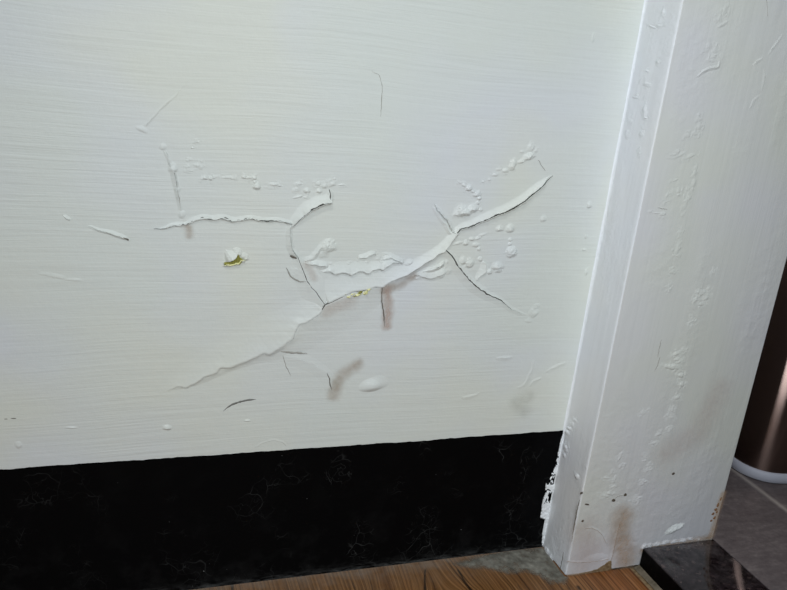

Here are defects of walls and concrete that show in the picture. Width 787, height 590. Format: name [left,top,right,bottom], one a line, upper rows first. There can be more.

crack [154,142,552,394]
peeling [540,435,564,544]